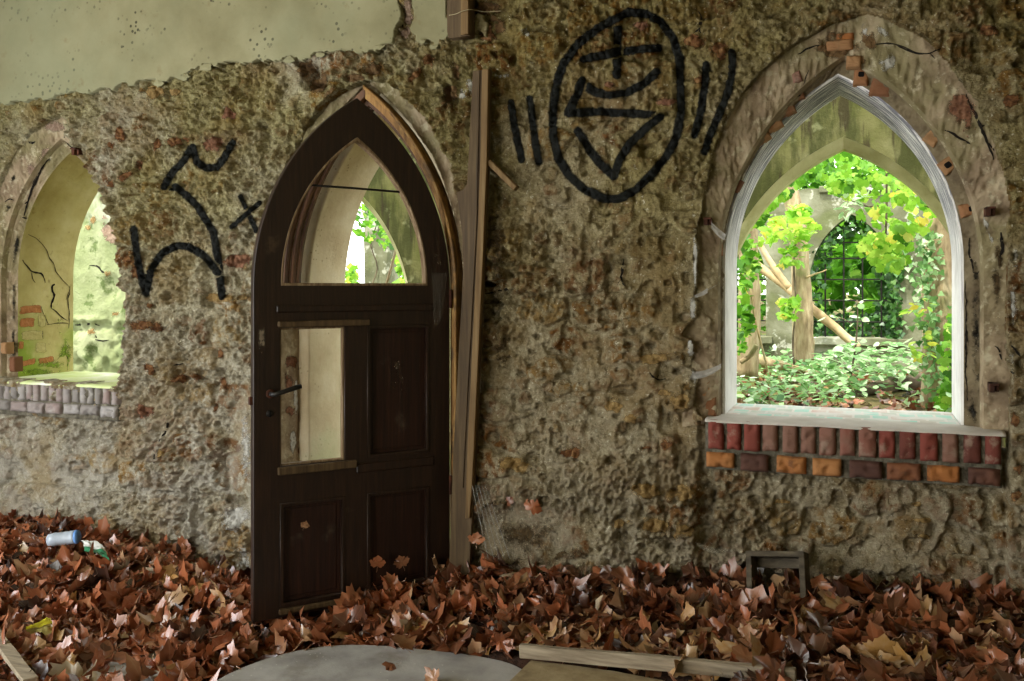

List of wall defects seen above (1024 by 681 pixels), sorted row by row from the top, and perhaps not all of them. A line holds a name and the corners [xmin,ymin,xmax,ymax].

flaking render [0,0,448,106]
spalling [441,62,460,109]
spalling [817,31,876,64]
crack [944,94,994,160]
crack [5,136,108,360]